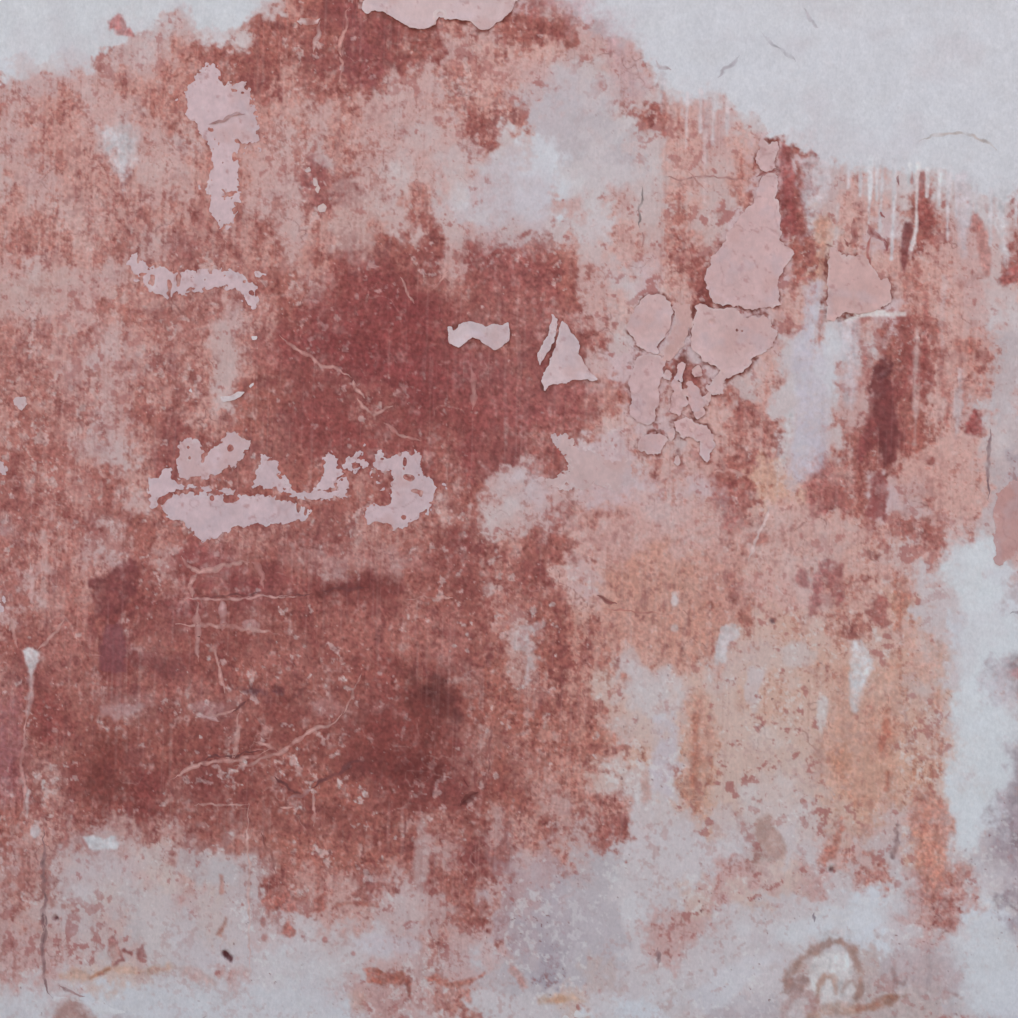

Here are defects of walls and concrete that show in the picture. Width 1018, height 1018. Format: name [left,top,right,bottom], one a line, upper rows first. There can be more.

spalling [326,0,655,103]
peeling [175,62,264,230]
peeling [126,253,266,311]
peeling [445,316,514,357]
peeling [532,133,794,548]
peeling [147,432,447,543]
spalling [800,444,866,531]
peeling [992,477,1018,593]
crack [407,593,453,601]
crack [173,556,372,826]
spalling [974,648,1018,718]
crack [194,802,277,969]